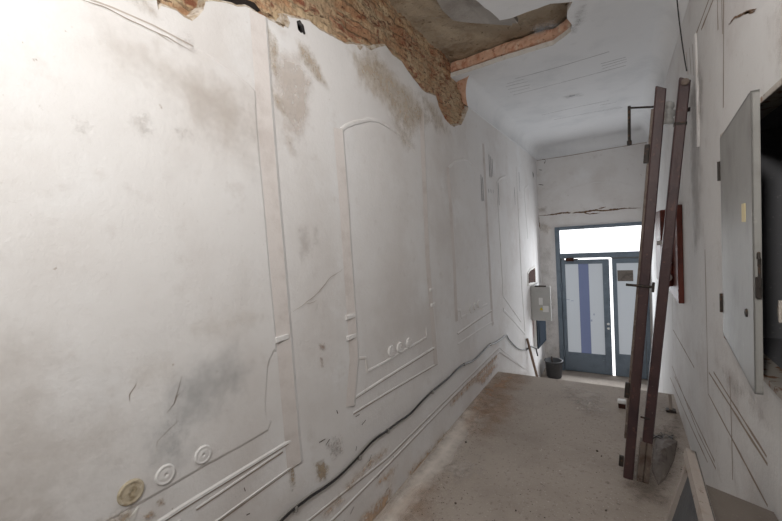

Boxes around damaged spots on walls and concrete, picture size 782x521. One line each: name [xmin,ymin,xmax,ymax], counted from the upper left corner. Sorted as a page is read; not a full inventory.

flaking render [157,0,468,127]
crack [539,206,636,227]